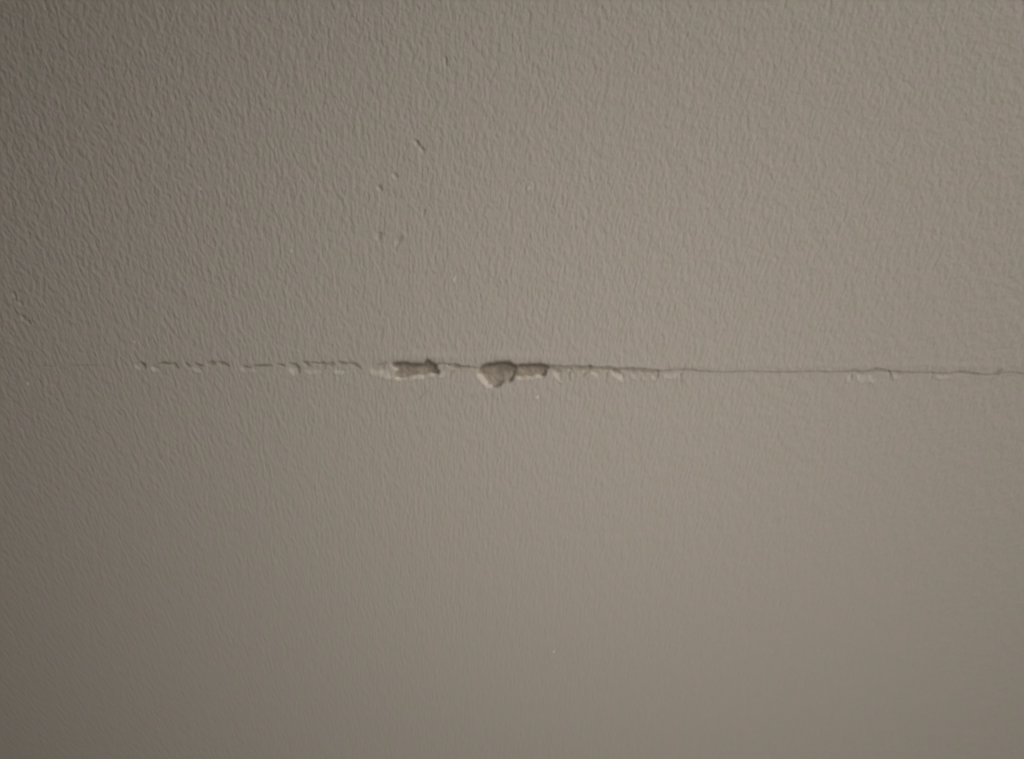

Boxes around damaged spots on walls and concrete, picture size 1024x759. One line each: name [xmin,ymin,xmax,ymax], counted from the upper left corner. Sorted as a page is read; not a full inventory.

crack [139,360,362,375]
flaking render [369,358,441,383]
crack [438,362,478,376]
flaking render [475,361,564,390]
crack [549,364,1024,387]